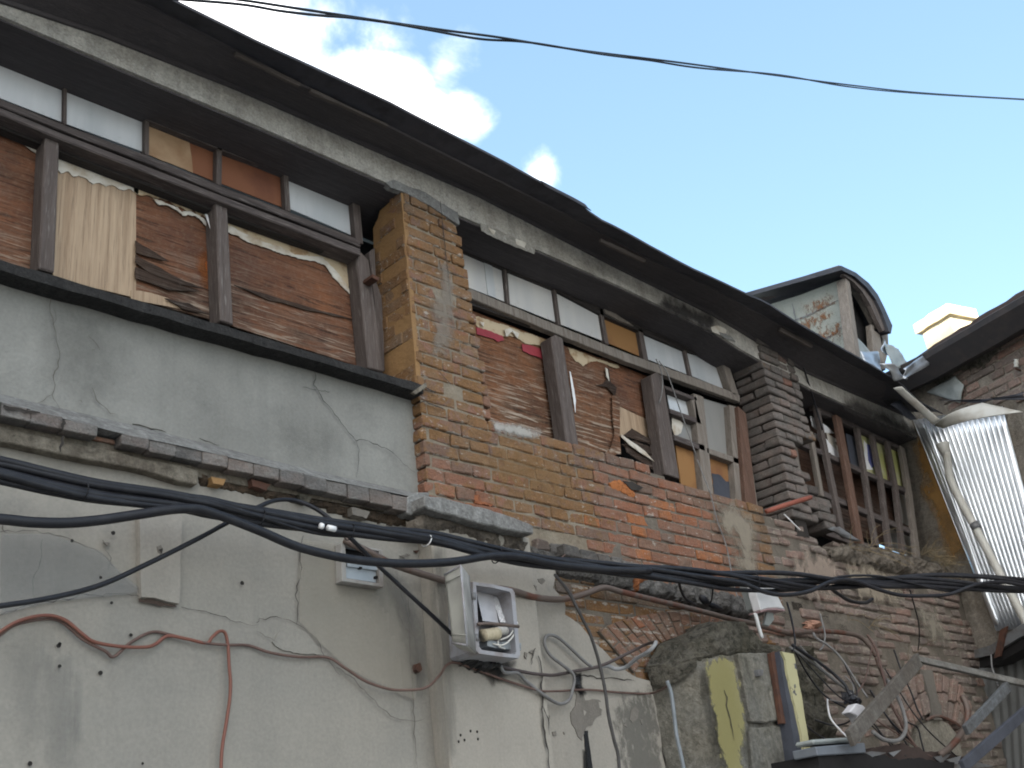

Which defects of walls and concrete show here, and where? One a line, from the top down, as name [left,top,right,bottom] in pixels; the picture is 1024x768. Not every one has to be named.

crack [3,300,165,452]
crack [306,371,414,477]
corrosion [800,299,840,339]
crack [0,530,421,756]
spalling [534,516,1007,768]